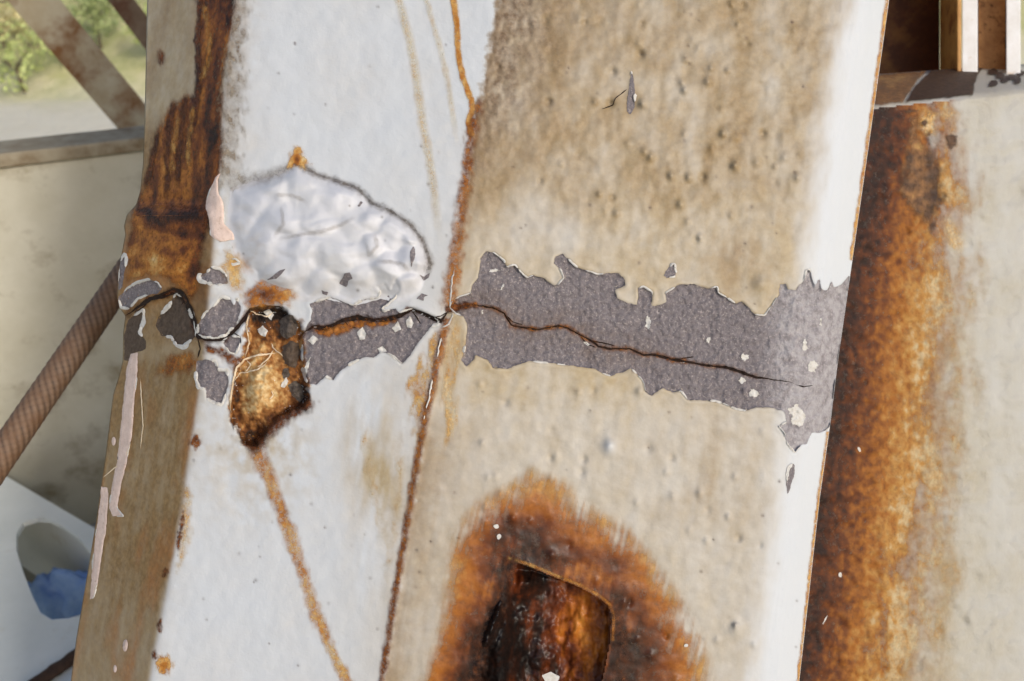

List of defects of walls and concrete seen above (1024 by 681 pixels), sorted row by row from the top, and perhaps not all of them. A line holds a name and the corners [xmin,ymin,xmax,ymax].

corrosion [127,0,235,297]
crack [127,287,286,357]
spalling [118,253,440,446]
corrosion [379,0,481,681]
crack [302,302,813,387]
peeling [450,251,850,494]
corrosion [798,0,969,681]
corrosion [250,435,350,681]
corrosion [428,471,705,681]